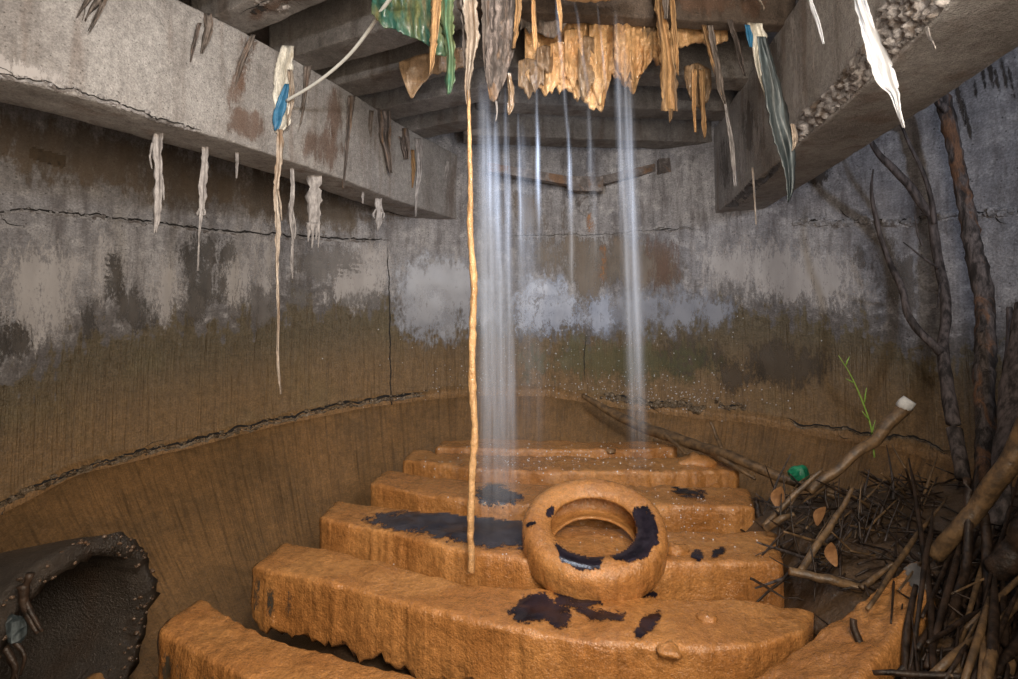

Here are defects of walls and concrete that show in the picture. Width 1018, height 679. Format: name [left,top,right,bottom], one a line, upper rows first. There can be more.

crack [0,67,202,133]
damp [0,109,308,365]
crack [0,207,428,515]
damp [289,191,917,393]